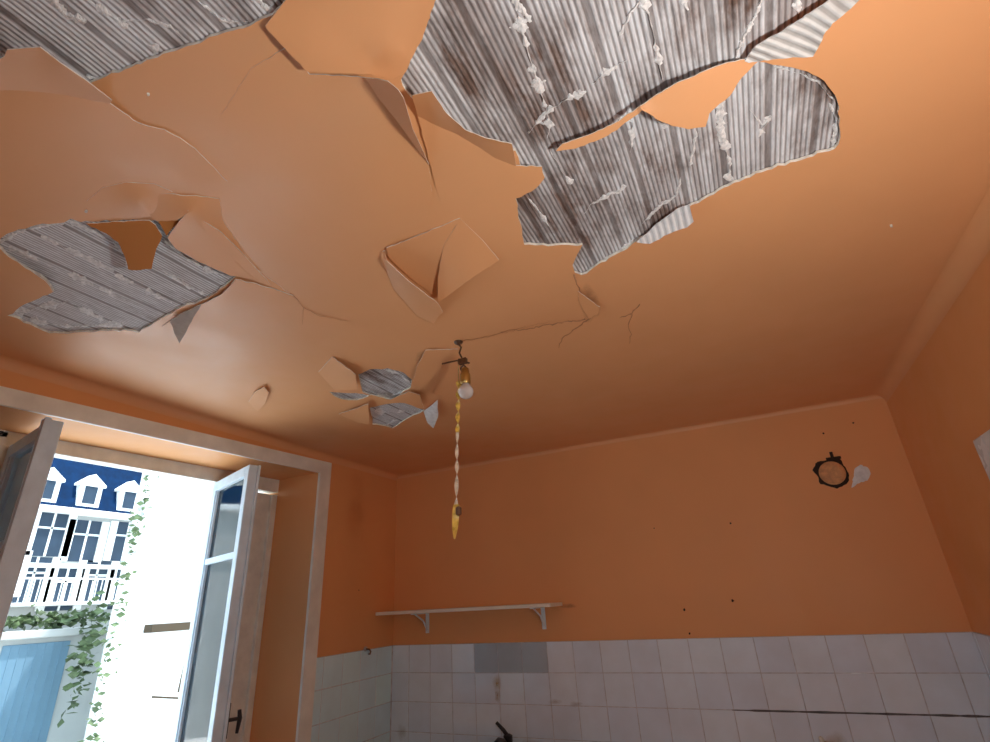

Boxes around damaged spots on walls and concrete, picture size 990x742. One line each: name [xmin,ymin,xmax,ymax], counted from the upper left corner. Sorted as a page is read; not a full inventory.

peeling [0,0,859,343]
crack [473,318,589,345]
peeling [319,349,461,428]